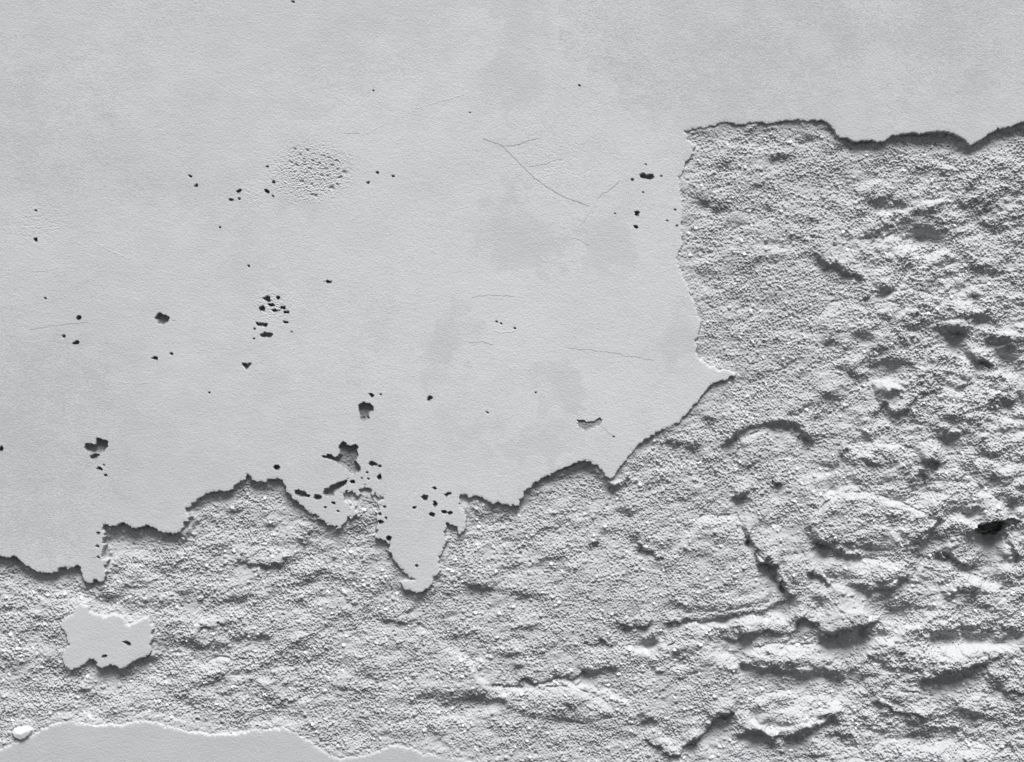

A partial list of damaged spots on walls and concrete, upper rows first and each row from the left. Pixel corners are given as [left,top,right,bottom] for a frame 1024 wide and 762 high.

crack [483,138,620,245]
hole [155,313,170,325]
hole [253,296,293,340]
hole [359,393,382,422]
spalling [577,418,602,430]
hole [84,438,109,478]
spalling [322,442,361,475]
spalling [863,457,884,470]
hole [295,478,355,500]
hole [421,487,453,517]
spalling [673,648,694,662]
flaking render [12,726,34,741]